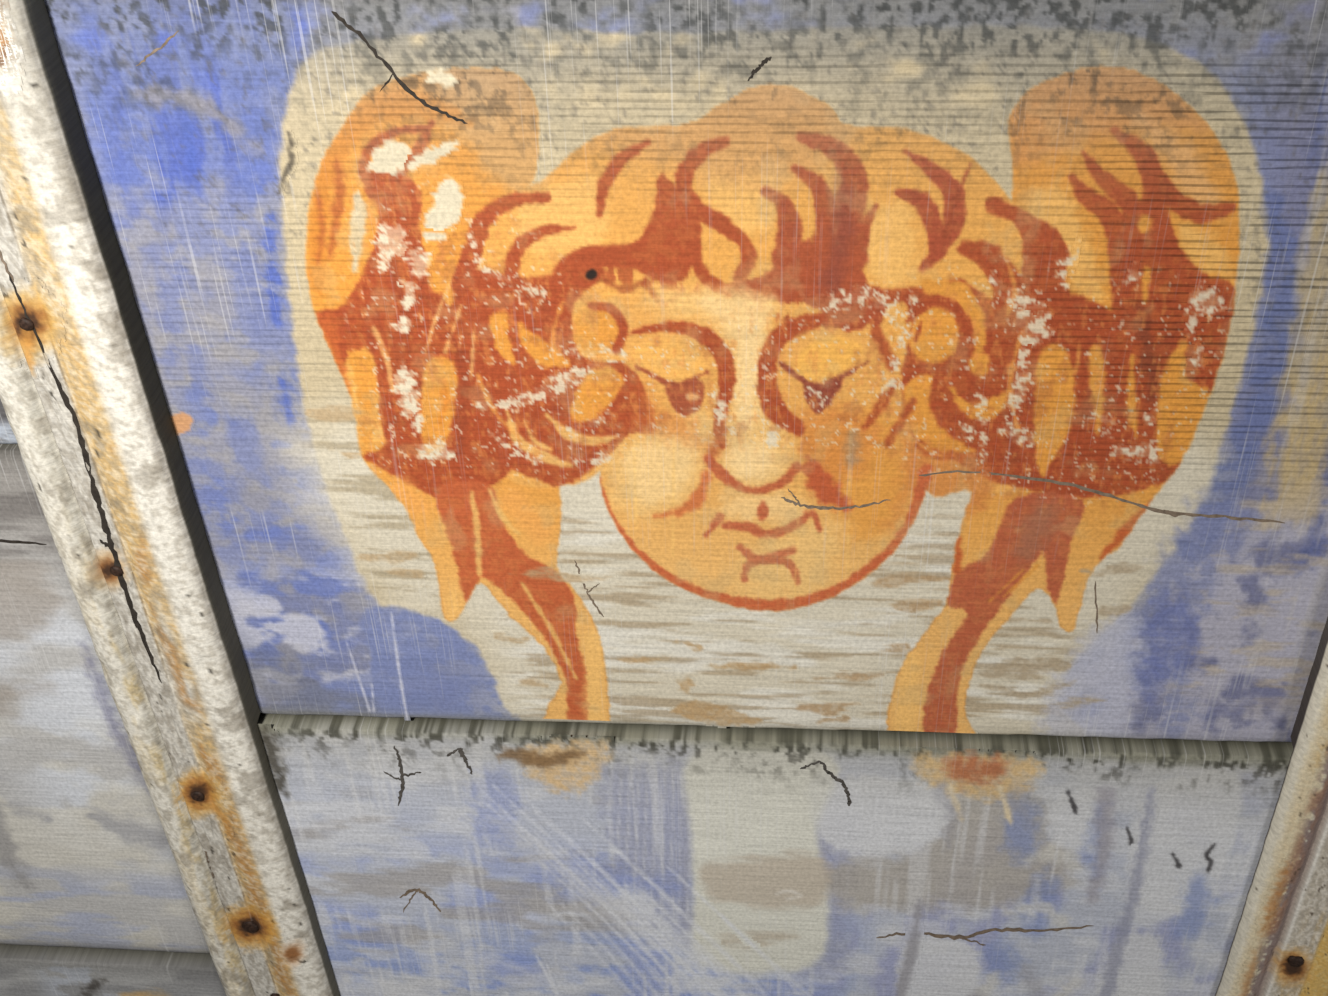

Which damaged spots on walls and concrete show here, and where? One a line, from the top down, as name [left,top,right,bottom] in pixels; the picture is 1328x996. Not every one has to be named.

crack [331,11,468,124]
peeling [363,135,548,335]
corrosion [0,276,67,380]
crack [0,251,162,683]
peeling [387,358,461,467]
peeling [474,340,637,475]
peeling [957,269,1057,477]
crack [919,470,1284,523]
corrosion [80,544,135,596]
corrosion [212,896,310,972]
crack [877,925,1093,946]
corrosion [1236,858,1321,996]